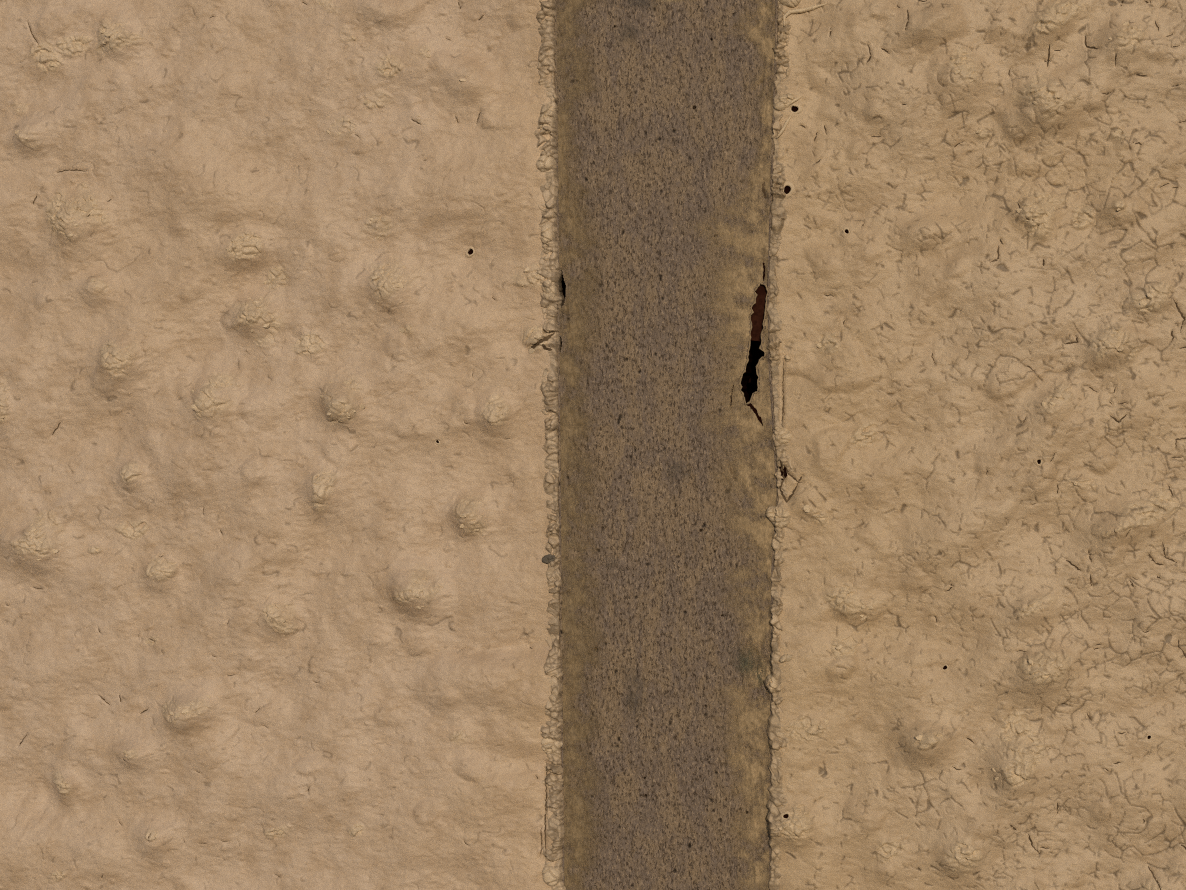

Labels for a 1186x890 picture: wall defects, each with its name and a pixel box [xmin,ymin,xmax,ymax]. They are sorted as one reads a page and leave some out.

crack [866,0,927,64]
crack [1045,36,1178,95]
crack [1171,300,1186,349]
crack [779,363,787,426]
crack [1064,335,1128,423]
crack [779,460,802,503]
crack [1066,551,1092,586]
crack [1125,529,1177,587]
crack [1009,824,1049,854]